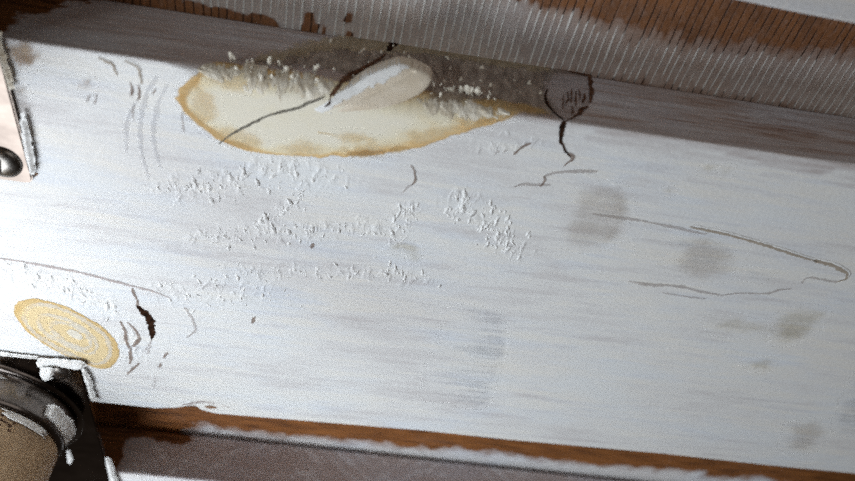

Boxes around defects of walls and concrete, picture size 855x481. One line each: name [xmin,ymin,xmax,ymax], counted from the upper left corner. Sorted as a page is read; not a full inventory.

peeling [198,52,342,102]
peeling [415,56,510,122]
crack [540,67,594,187]
crack [690,224,851,282]
crack [120,288,168,375]